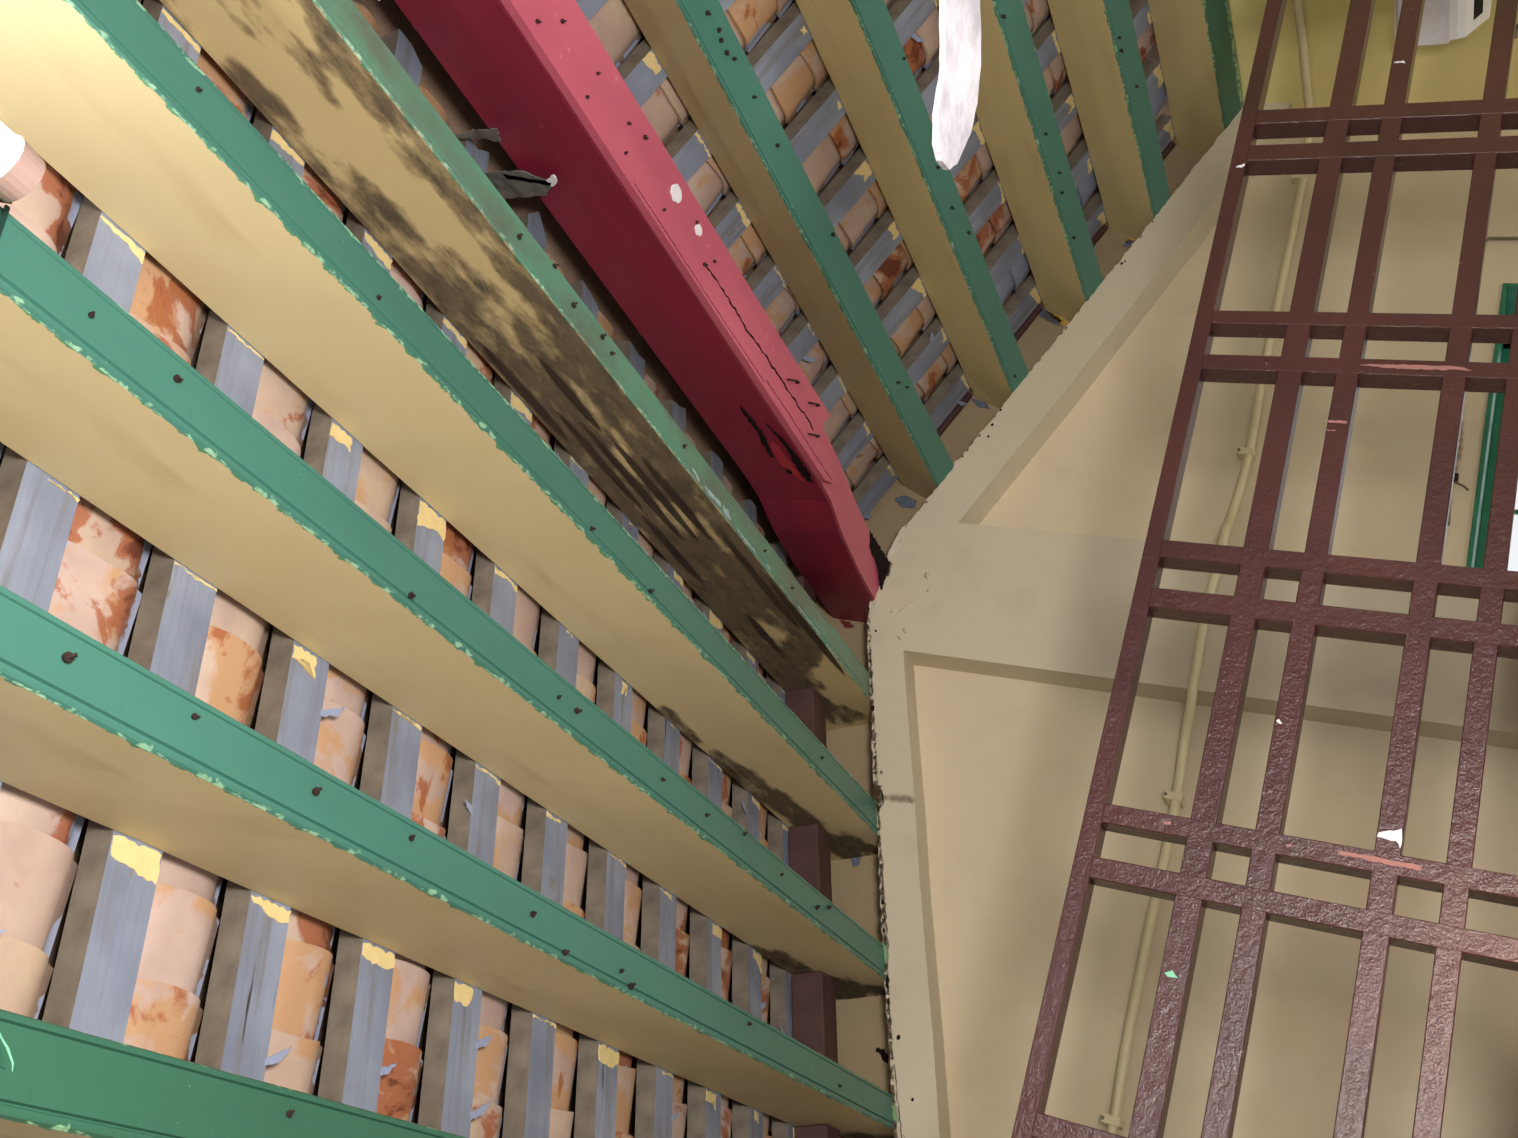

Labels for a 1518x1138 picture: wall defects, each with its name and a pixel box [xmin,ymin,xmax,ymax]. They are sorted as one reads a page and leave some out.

leakage [225,61,297,136]
leakage [303,0,878,782]
crack [634,183,832,480]
peeling [770,442,805,482]
leakage [659,706,897,1138]
peeling [1339,829,1422,870]